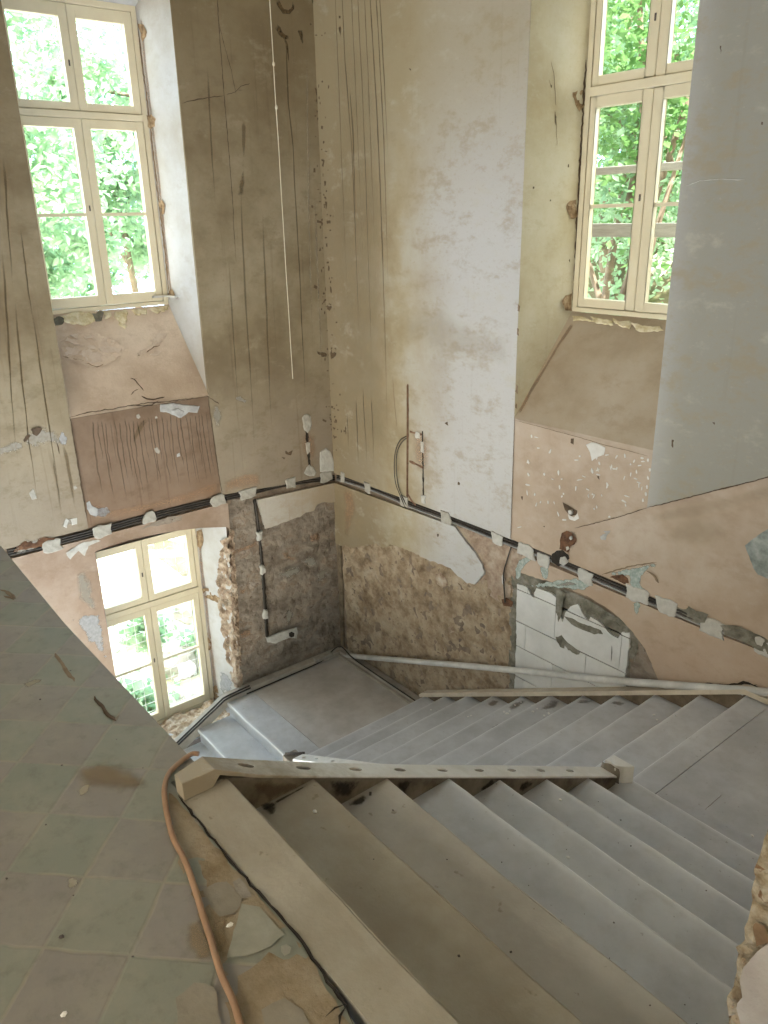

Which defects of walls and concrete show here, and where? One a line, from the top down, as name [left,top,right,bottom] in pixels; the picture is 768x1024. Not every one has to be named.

crack [184,0,250,252]
water stain [335,0,386,264]
crack [56,378,222,516]
flaking render [202,438,657,698]